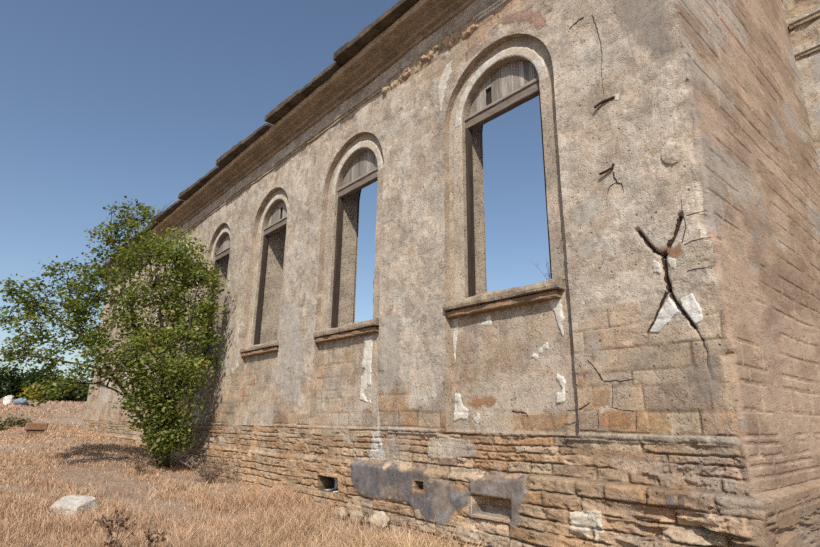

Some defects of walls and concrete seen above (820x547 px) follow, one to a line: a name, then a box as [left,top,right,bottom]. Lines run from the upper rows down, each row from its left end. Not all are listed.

flaking render [493,10,546,29]
flaking render [382,14,478,98]
peeling [438,60,453,112]
peeling [549,298,565,336]
crack [638,199,713,379]
peeling [649,293,703,333]
peeling [360,316,399,404]
peeling [453,393,495,424]
peeling [556,373,566,404]
crack [566,360,637,430]